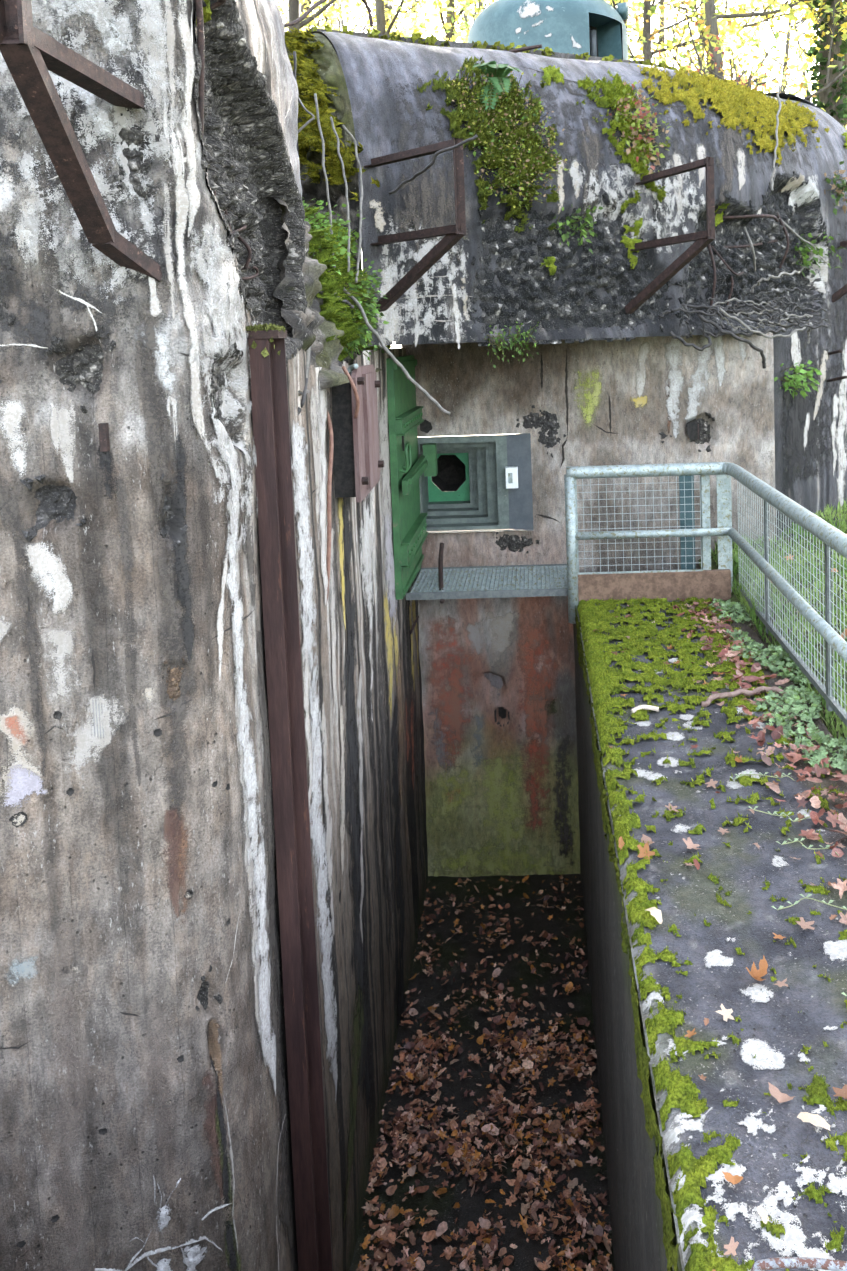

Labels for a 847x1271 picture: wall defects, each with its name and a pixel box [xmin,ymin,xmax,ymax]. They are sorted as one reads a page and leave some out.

spalling [192,0,308,366]
spalling [468,170,829,348]
spalling [45,325,116,413]
spalling [516,405,566,458]
spalling [686,412,715,453]
spalling [20,474,86,542]
water stain [0,0,293,1271]
peeling [0,702,47,808]
water stain [291,381,575,1231]
spalling [494,707,510,727]
rust [163,807,189,923]